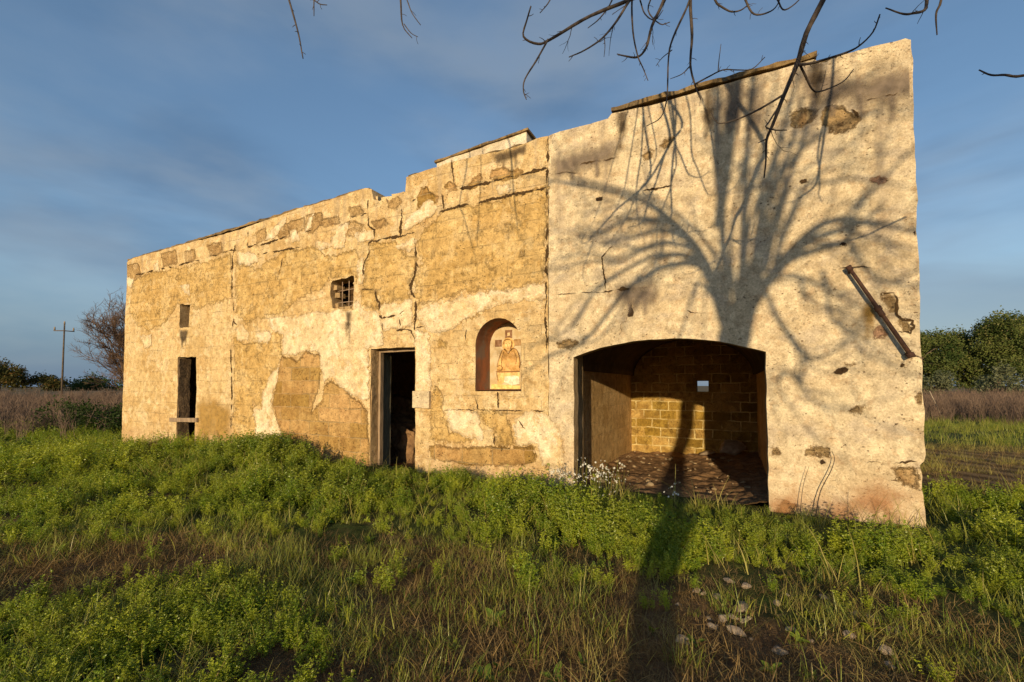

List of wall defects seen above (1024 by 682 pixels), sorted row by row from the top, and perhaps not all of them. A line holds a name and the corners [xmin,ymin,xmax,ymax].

flaking render [789,104,861,134]
crack [440,138,646,349]
crack [352,199,424,340]
peeling [127,166,565,468]
flaking render [880,292,912,332]
flaking render [805,445,831,464]
flaking render [892,465,922,491]